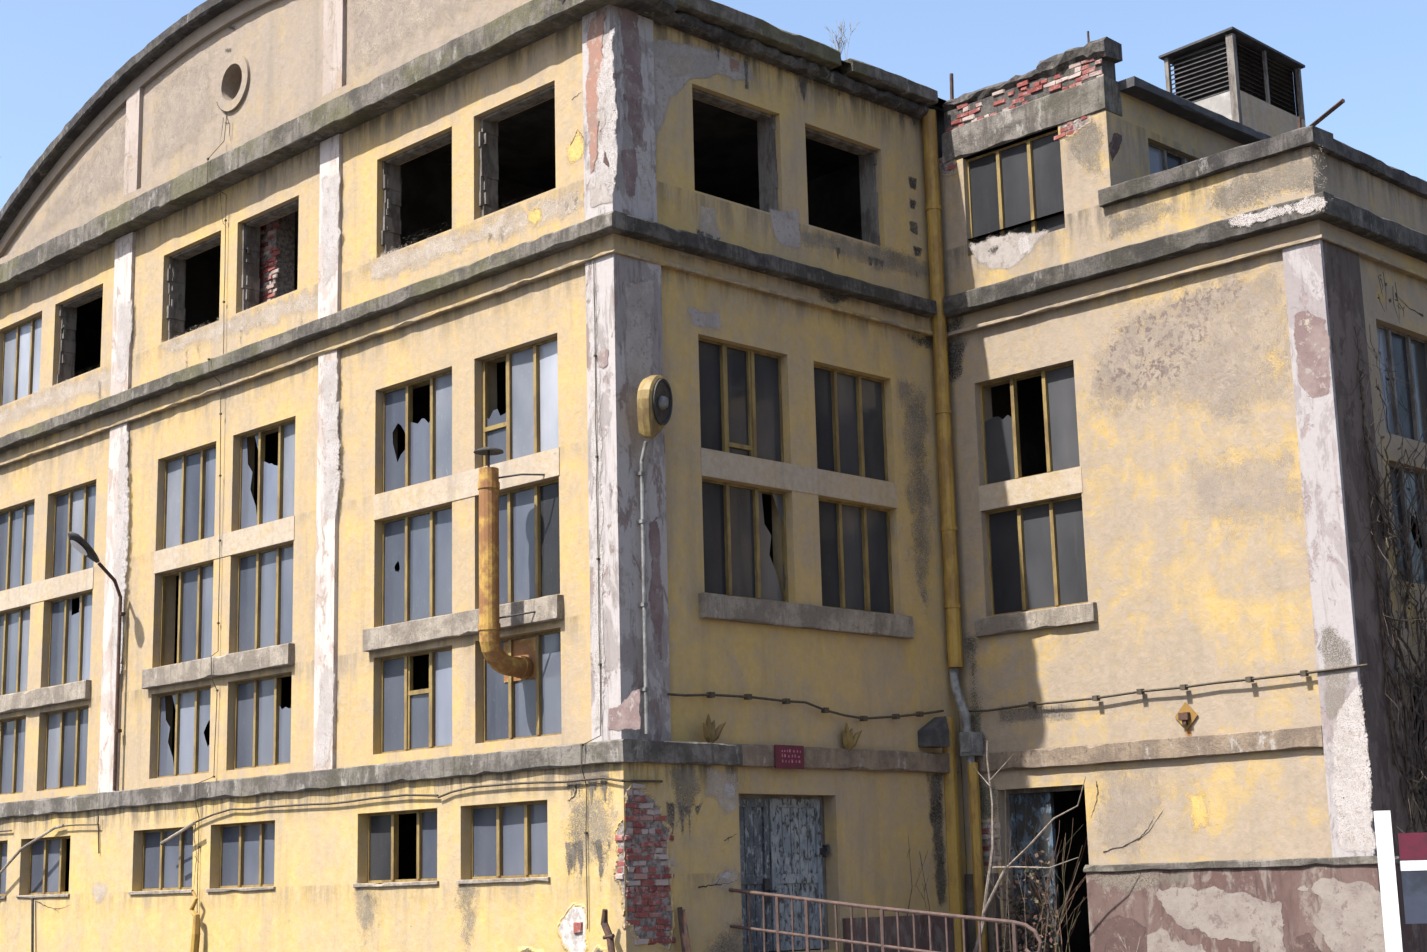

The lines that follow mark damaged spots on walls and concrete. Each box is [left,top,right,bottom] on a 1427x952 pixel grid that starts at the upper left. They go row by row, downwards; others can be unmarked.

peeling [365,12,640,283]
peeling [967,230,1049,270]
peeling [1228,196,1327,228]
peeling [1293,310,1331,398]
peeling [588,277,656,731]
peeling [649,517,664,661]
spalling [517,902,608,952]
water stain [564,763,617,892]
spalling [613,782,676,951]
water stain [666,765,702,835]
peeling [1091,870,1386,952]
peeling [1329,681,1376,854]